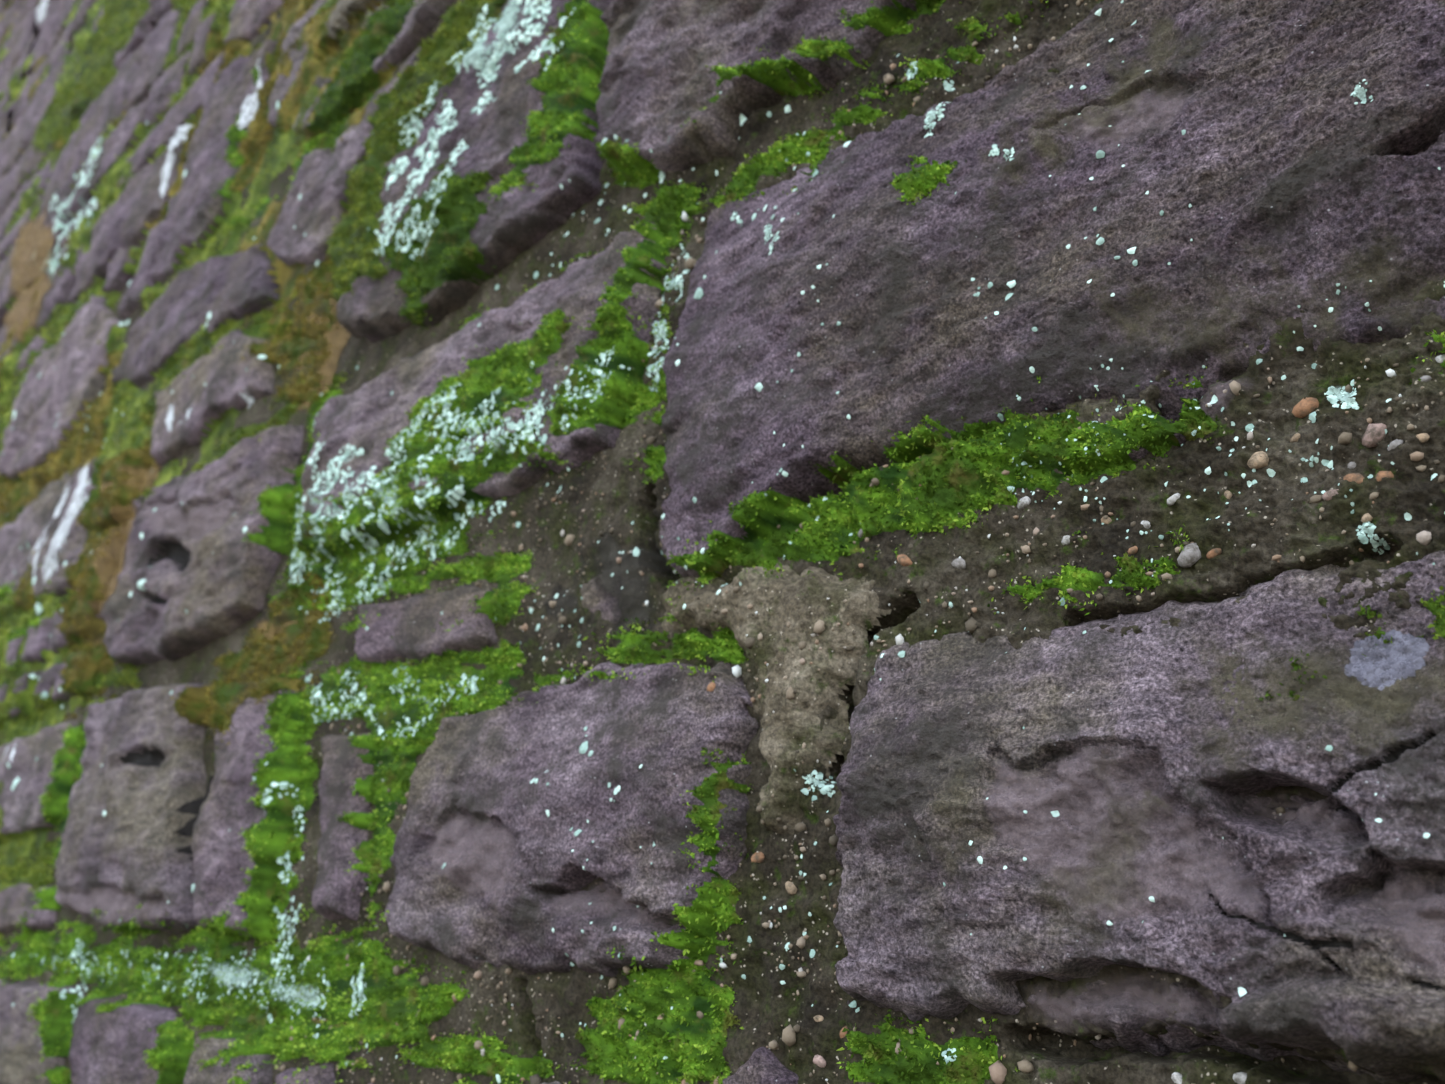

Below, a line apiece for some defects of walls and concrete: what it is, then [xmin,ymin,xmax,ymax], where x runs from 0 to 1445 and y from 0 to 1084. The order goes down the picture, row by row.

crack [1328,733,1436,811]
crack [1208,893,1353,970]
crack [1413,981,1443,990]